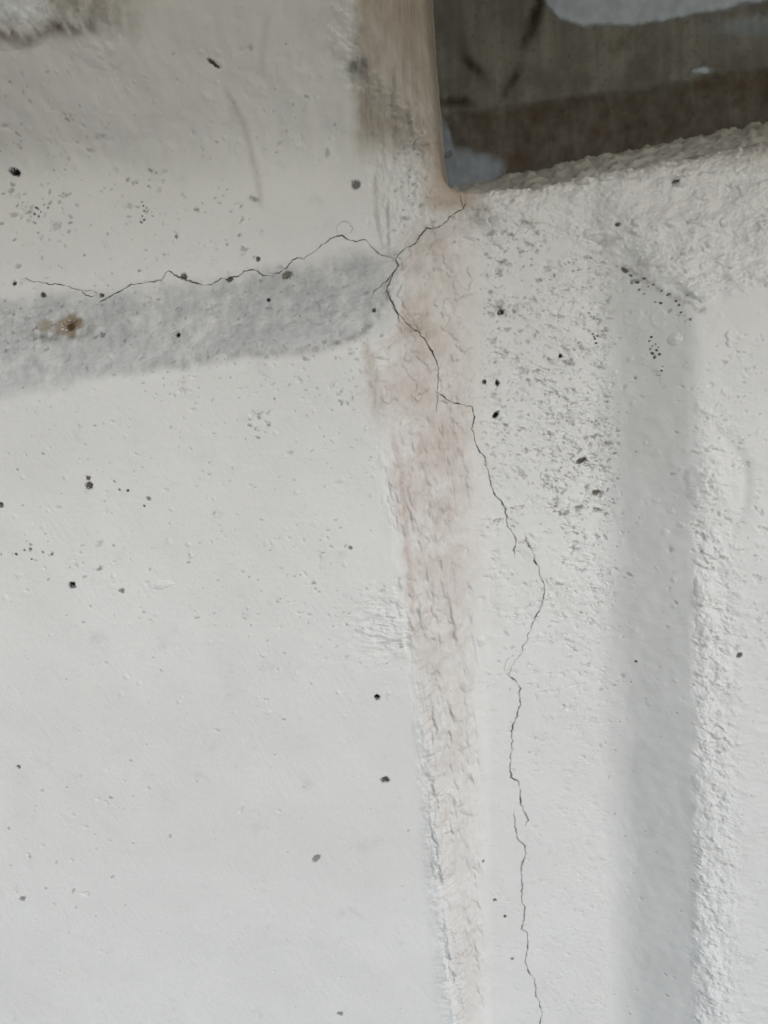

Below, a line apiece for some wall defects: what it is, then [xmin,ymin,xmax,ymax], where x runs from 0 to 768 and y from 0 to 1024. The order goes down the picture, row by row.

crack [26,197,545,635]
crack [509,758,529,863]